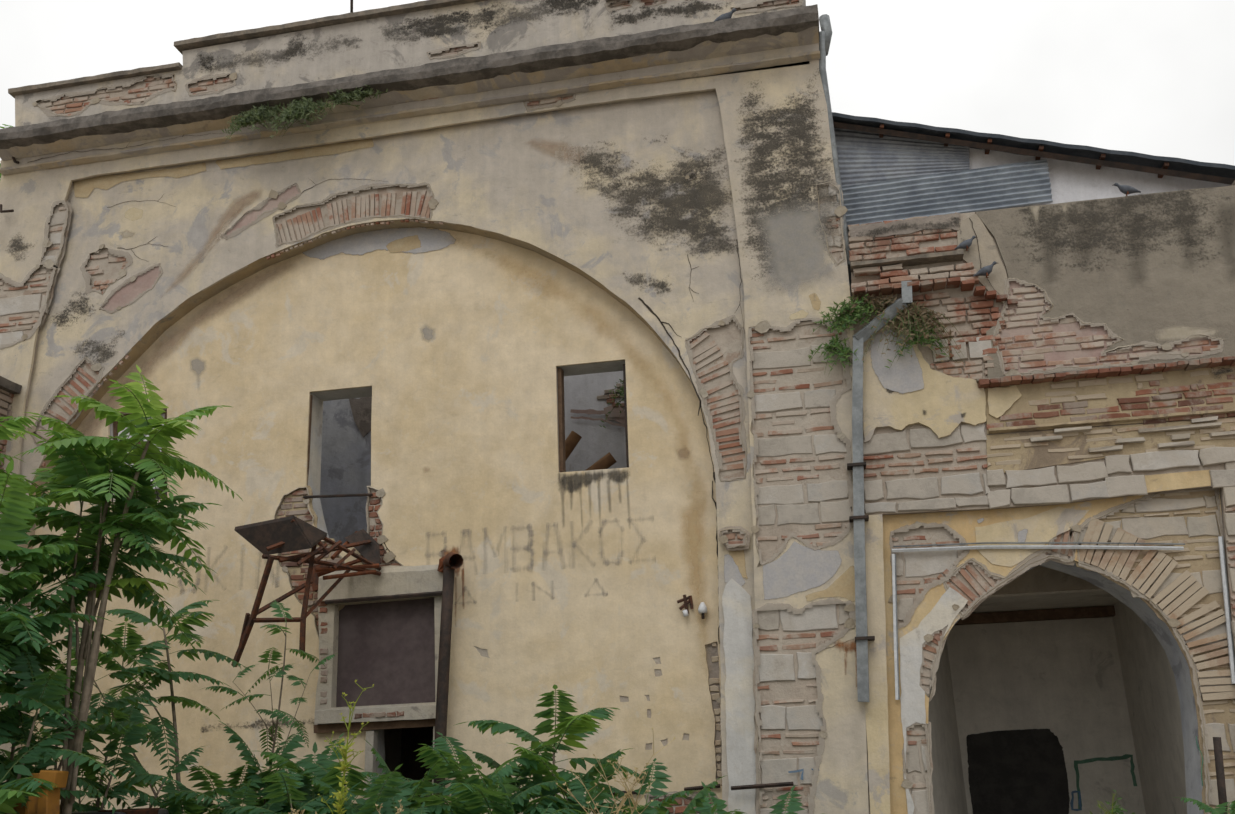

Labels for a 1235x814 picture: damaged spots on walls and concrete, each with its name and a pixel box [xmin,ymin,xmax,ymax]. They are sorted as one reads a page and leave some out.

water stain [385,0,597,41]
water stain [614,1,719,23]
spalling [0,138,374,349]
spalling [221,183,456,260]
water stain [626,274,670,292]
water stain [538,87,840,285]
spalling [992,278,1225,376]
water stain [1019,189,1218,270]
water stain [559,471,628,492]
spalling [274,485,345,704]
spalling [685,293,856,814]
spalling [888,488,1235,814]